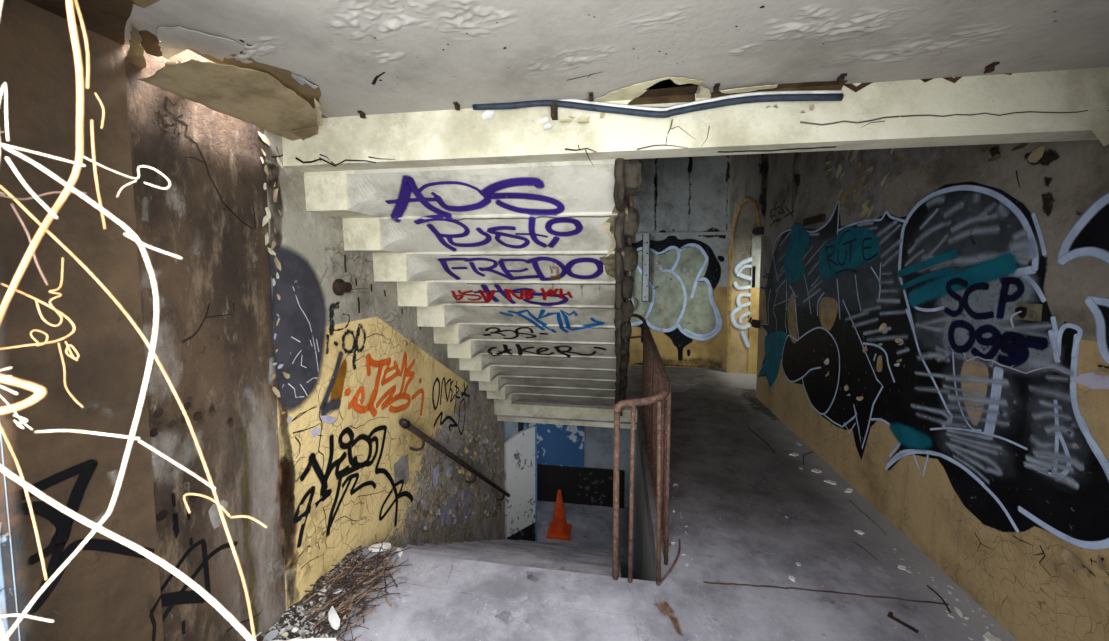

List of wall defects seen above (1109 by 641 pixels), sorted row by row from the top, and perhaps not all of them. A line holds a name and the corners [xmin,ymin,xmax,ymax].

crack [844,82,873,92]
crack [920,75,963,83]
crack [800,110,1109,128]
spalling [600,206,628,281]
crack [974,532,1109,577]